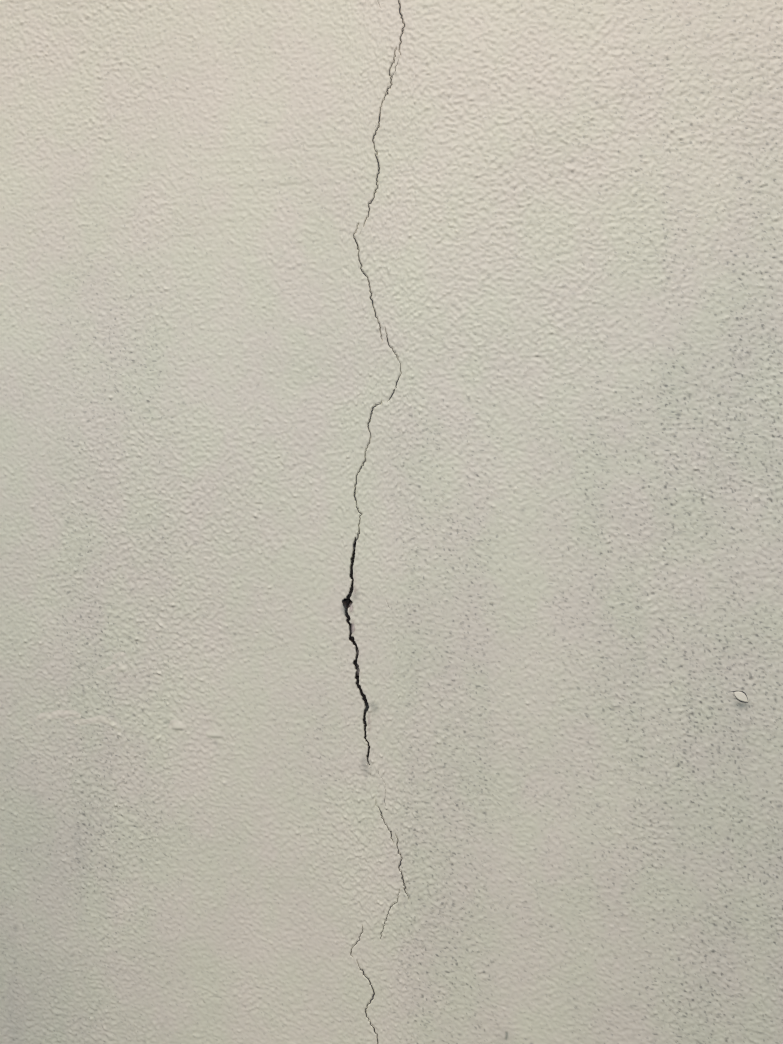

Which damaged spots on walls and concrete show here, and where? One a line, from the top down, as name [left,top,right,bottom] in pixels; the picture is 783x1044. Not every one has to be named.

crack [342,1,408,1044]